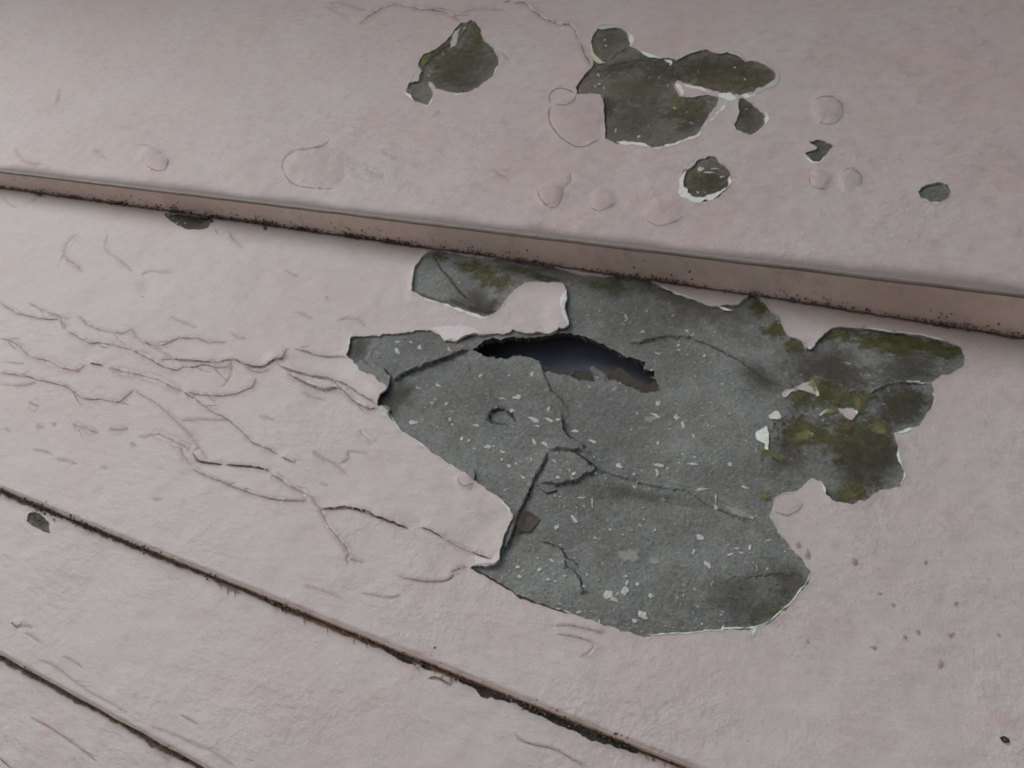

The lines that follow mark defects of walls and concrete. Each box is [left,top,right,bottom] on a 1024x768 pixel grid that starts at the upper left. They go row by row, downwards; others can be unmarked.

peeling [405,21,500,107]
peeling [547,25,780,149]
peeling [678,156,732,203]
peeling [806,141,833,163]
peeling [919,184,951,206]
crack [2,303,375,471]
peeling [347,251,965,638]
crack [323,506,444,539]